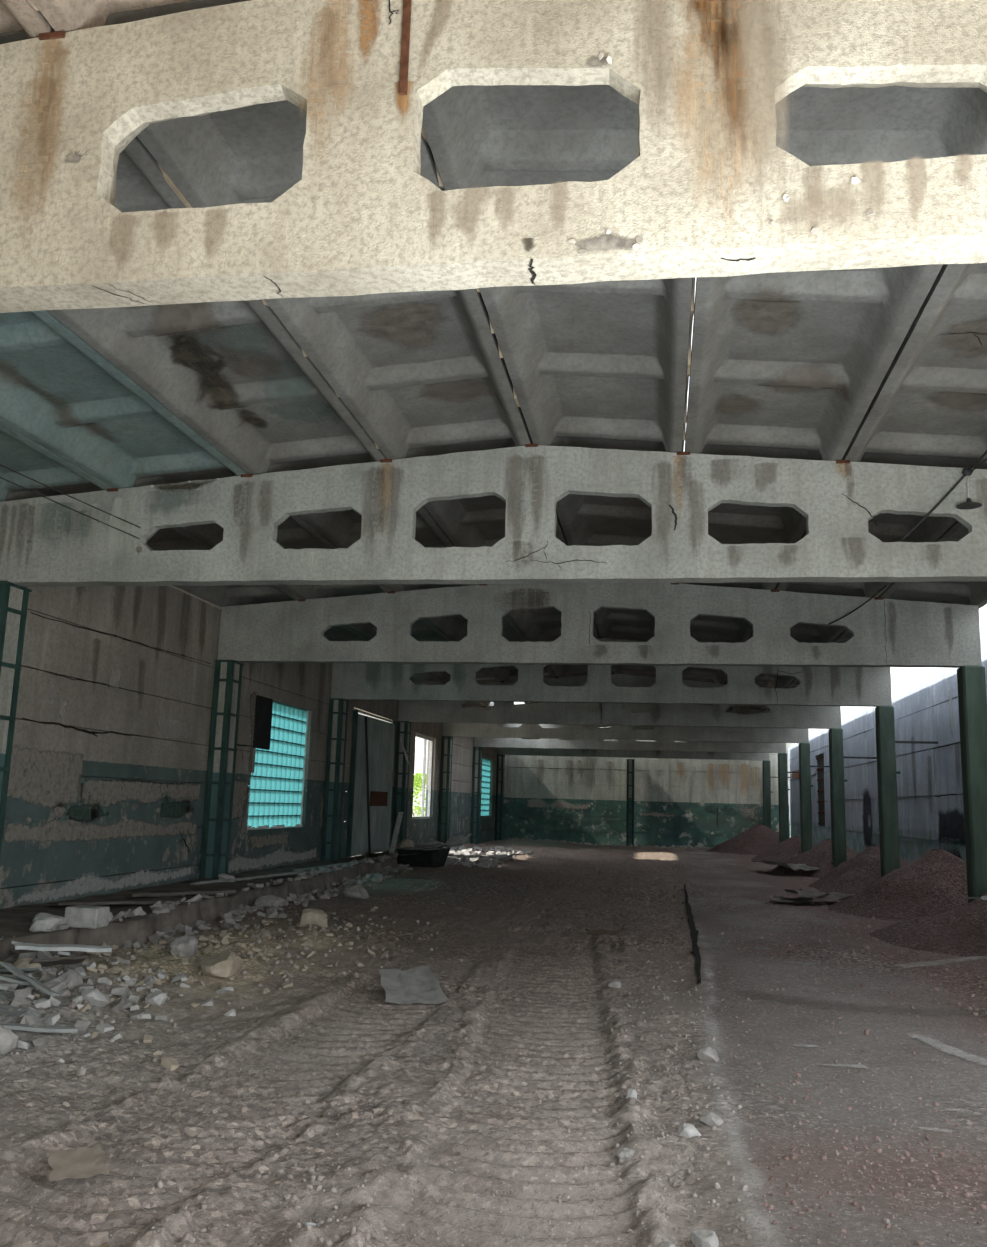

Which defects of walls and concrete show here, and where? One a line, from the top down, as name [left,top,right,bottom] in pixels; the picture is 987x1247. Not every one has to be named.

rust [360,0,378,55]
rust [688,0,747,132]
rust [396,81,410,113]
crack [528,259,536,285]
damp [155,302,280,427]
crack [669,504,677,531]
crack [22,718,140,737]
peeling [4,745,202,844]